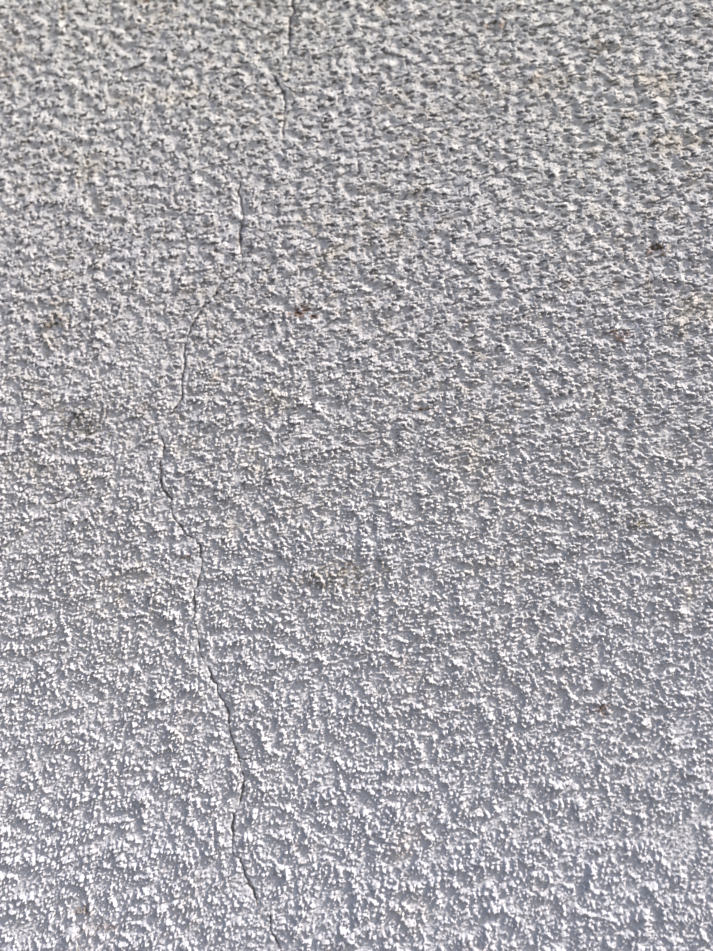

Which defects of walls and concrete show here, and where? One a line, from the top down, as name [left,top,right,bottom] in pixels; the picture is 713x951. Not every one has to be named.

crack [261,0,296,158]
crack [129,180,281,949]